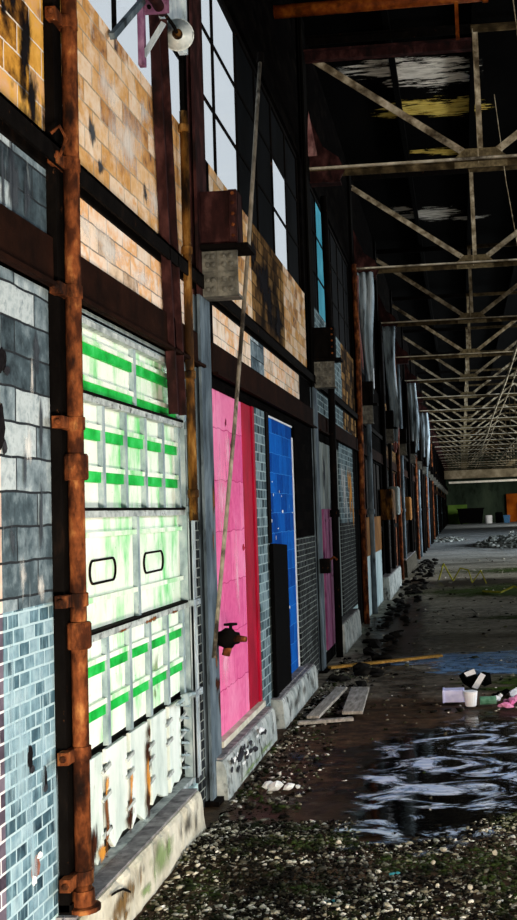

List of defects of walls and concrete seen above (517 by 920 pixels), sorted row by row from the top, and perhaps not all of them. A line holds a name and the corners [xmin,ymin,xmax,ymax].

leakage [28,80,36,123]
corrosion [91,777,110,871]
leakage [114,869,156,920]